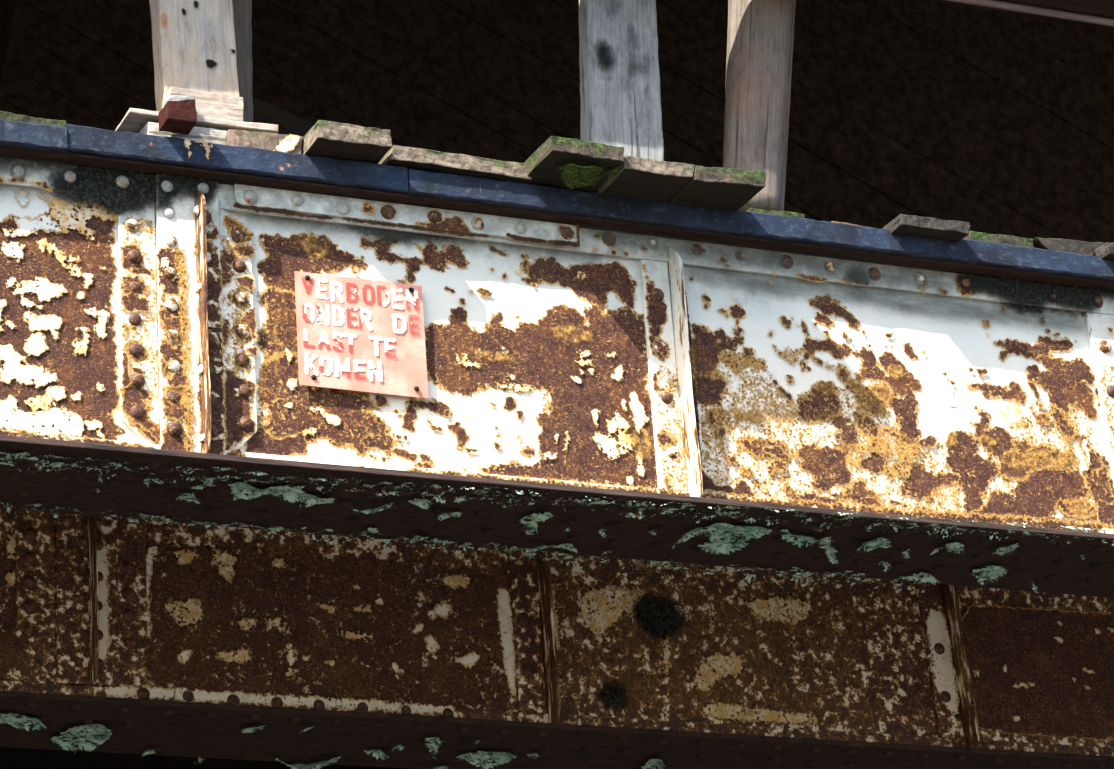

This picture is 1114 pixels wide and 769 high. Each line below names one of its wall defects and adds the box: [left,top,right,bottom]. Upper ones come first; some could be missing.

rust [0,177,54,193]
peeling [257,232,470,293]
peeling [0,188,141,447]
rust [119,202,1114,534]
peeling [0,713,112,752]
peeling [276,757,340,769]
peeling [365,744,406,760]
peeling [425,737,538,769]